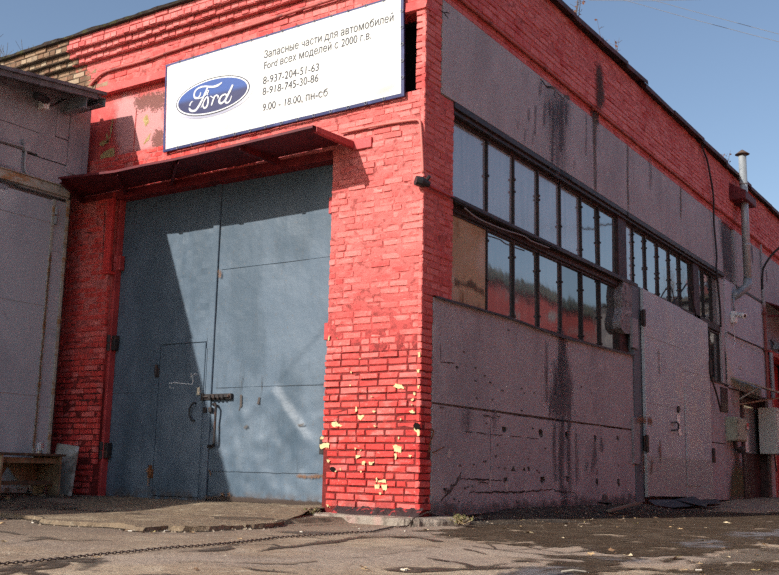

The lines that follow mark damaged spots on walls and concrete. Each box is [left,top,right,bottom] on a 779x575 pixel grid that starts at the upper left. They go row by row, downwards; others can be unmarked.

corrosion [33,254,51,448]
crack [441,431,574,501]
leakage [479,330,635,515]